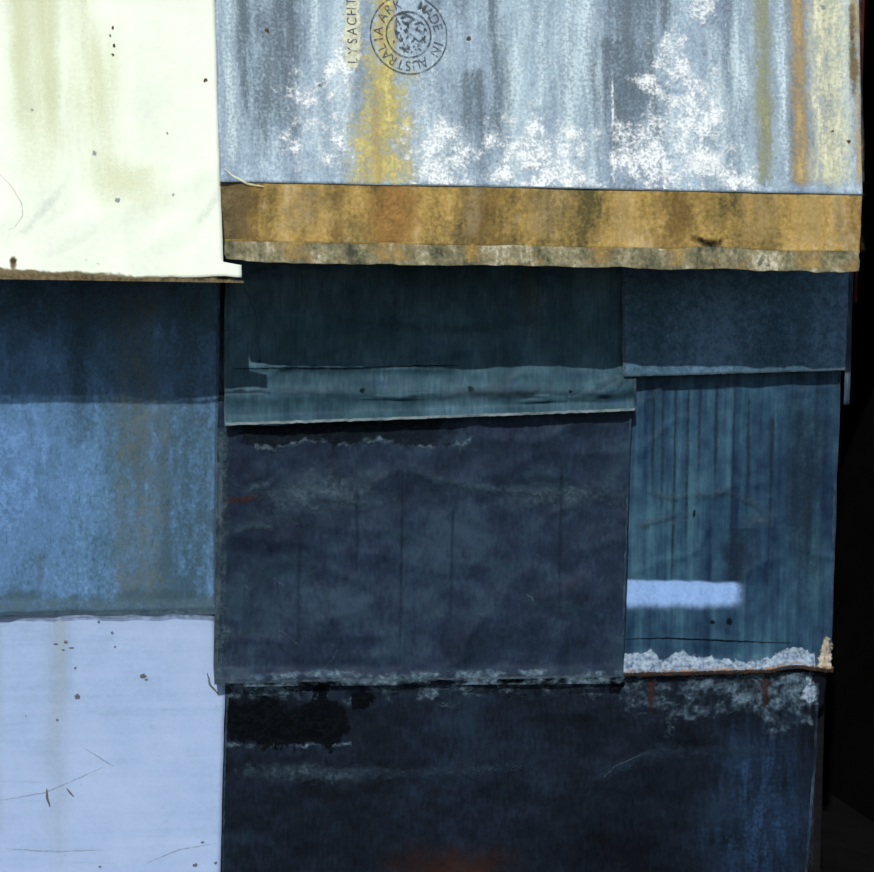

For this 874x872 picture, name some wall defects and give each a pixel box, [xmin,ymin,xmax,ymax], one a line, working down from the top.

corrosion [220,0,862,267]
leakage [706,3,752,187]
leakage [774,0,789,173]
corrosion [0,257,244,283]
peeling [225,671,438,754]
peeling [457,671,502,685]